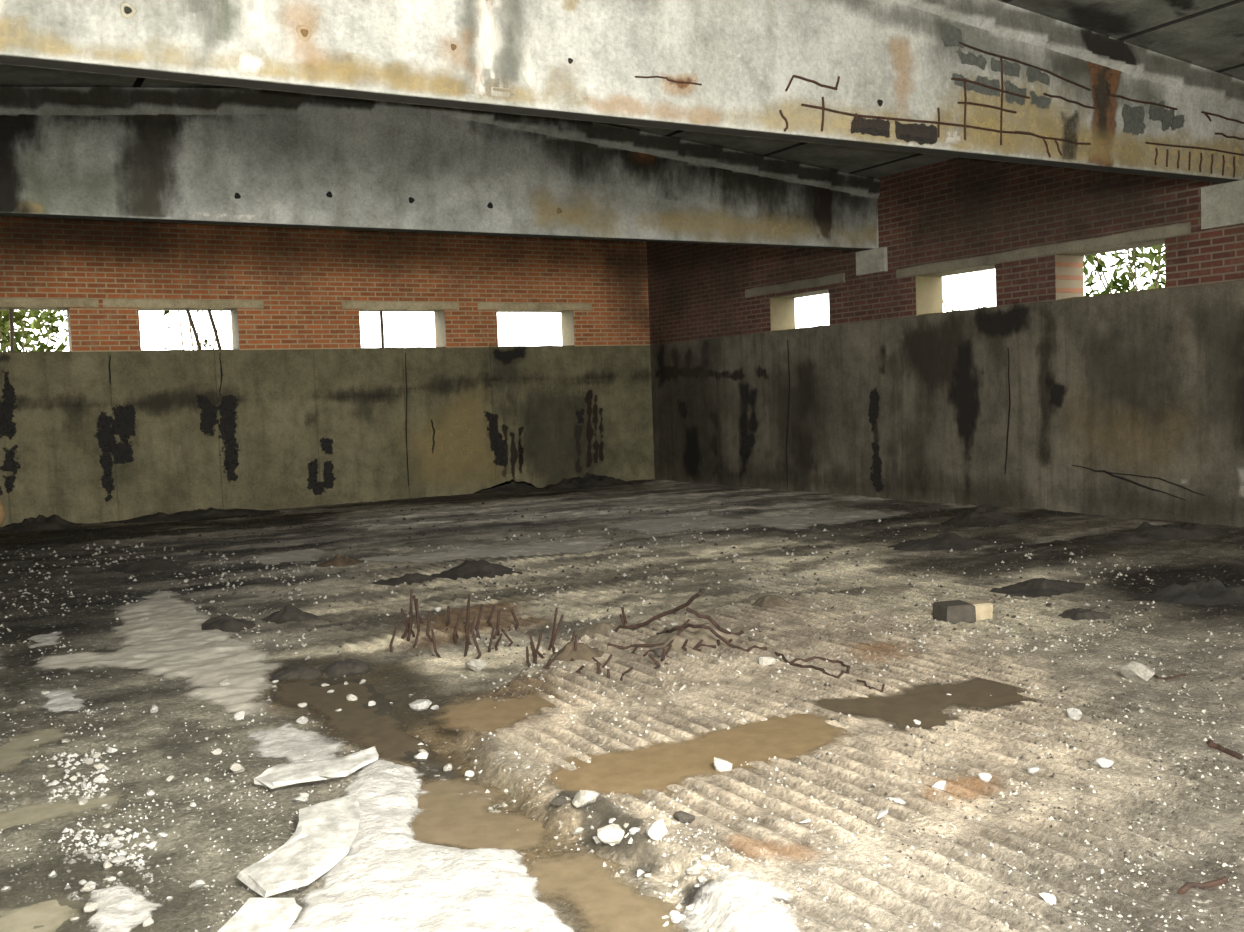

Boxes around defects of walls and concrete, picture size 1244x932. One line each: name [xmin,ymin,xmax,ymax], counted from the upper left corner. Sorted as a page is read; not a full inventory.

water stain [0,86,376,217]
water stain [238,55,284,74]
water stain [299,65,357,81]
spalling [785,23,1095,157]
rust [1088,61,1121,166]
spalling [1107,94,1244,177]
water stain [906,305,1029,385]
water stain [128,392,239,413]
water stain [502,424,524,479]
water stain [575,372,614,473]
water stain [1038,315,1065,464]